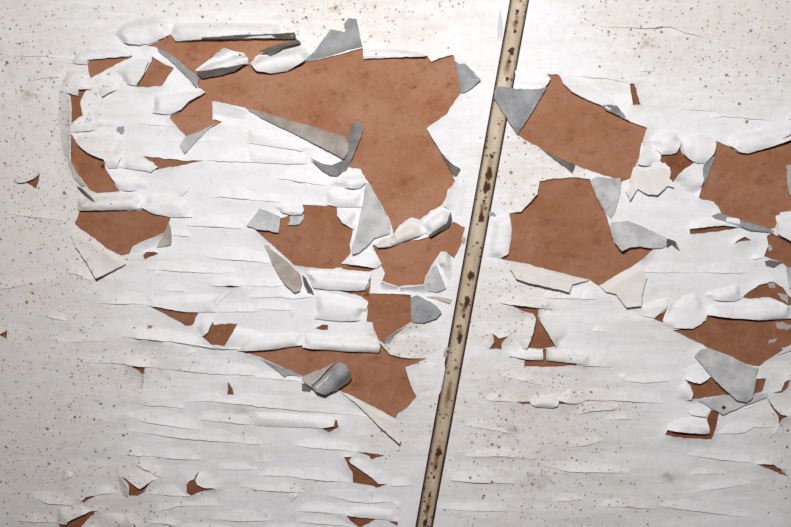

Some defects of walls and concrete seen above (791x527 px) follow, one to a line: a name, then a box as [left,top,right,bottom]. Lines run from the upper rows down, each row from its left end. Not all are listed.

peeling [13,171,40,188]
rust [478,154,494,222]
peeling [58,16,481,444]
peeling [482,70,791,439]
rust [456,296,470,344]
peeling [118,469,162,497]
peeling [187,471,213,496]
peeling [344,451,388,488]
peeling [55,496,136,527]
peeling [345,506,399,527]